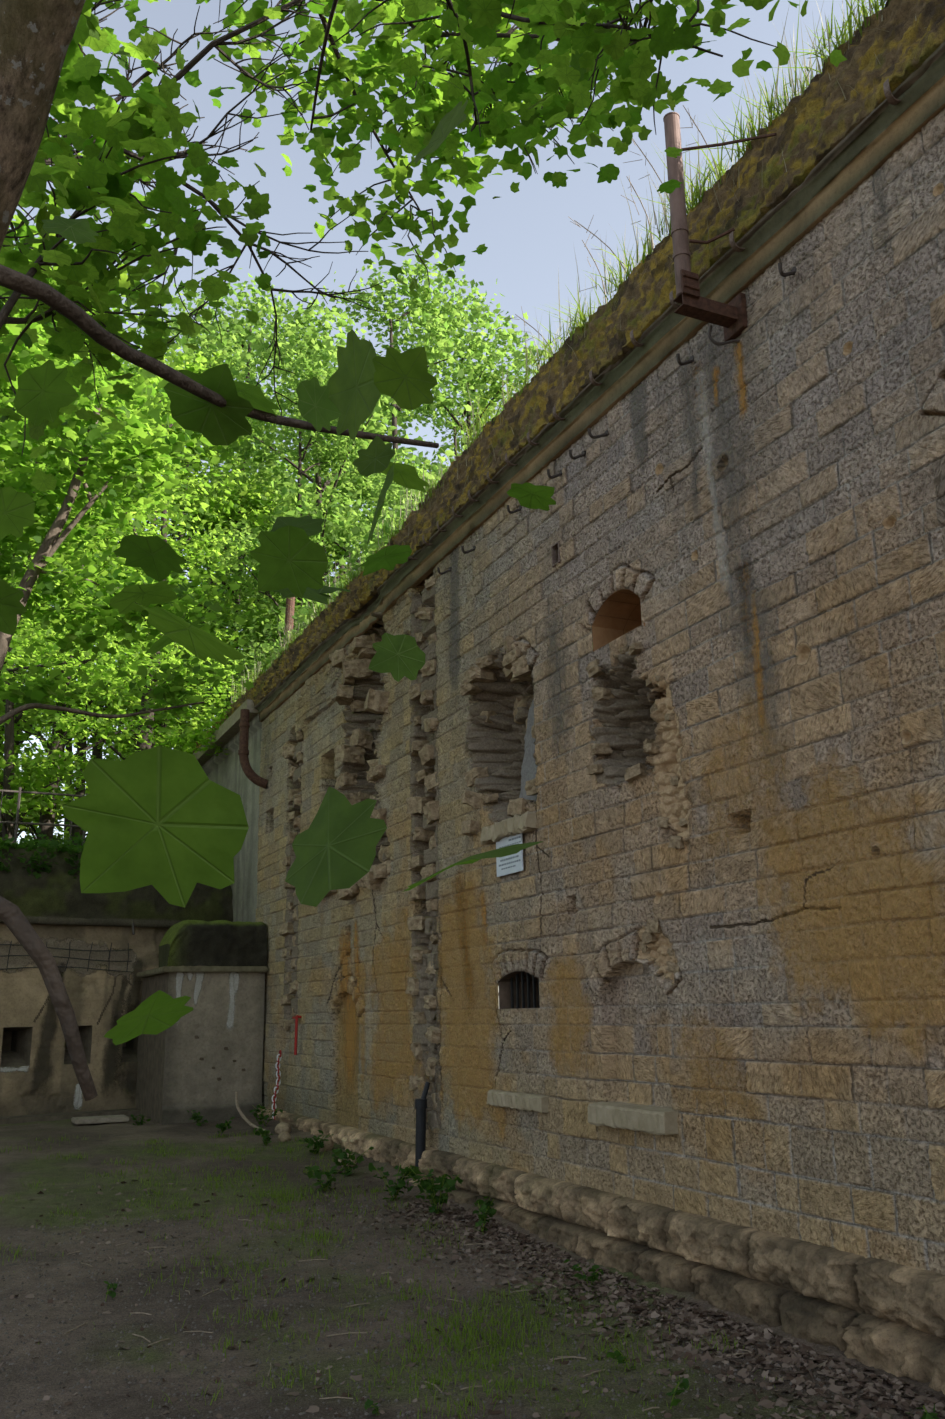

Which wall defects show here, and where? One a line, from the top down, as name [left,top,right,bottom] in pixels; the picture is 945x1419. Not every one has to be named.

spalling [460,636,538,836]
spalling [586,642,692,850]
spalling [329,573,442,1131]
crack [710,869,839,929]
leakage [103,960,143,1094]
leakage [176,972,204,1004]
leakage [227,972,239,1028]
leakage [74,1083,82,1108]